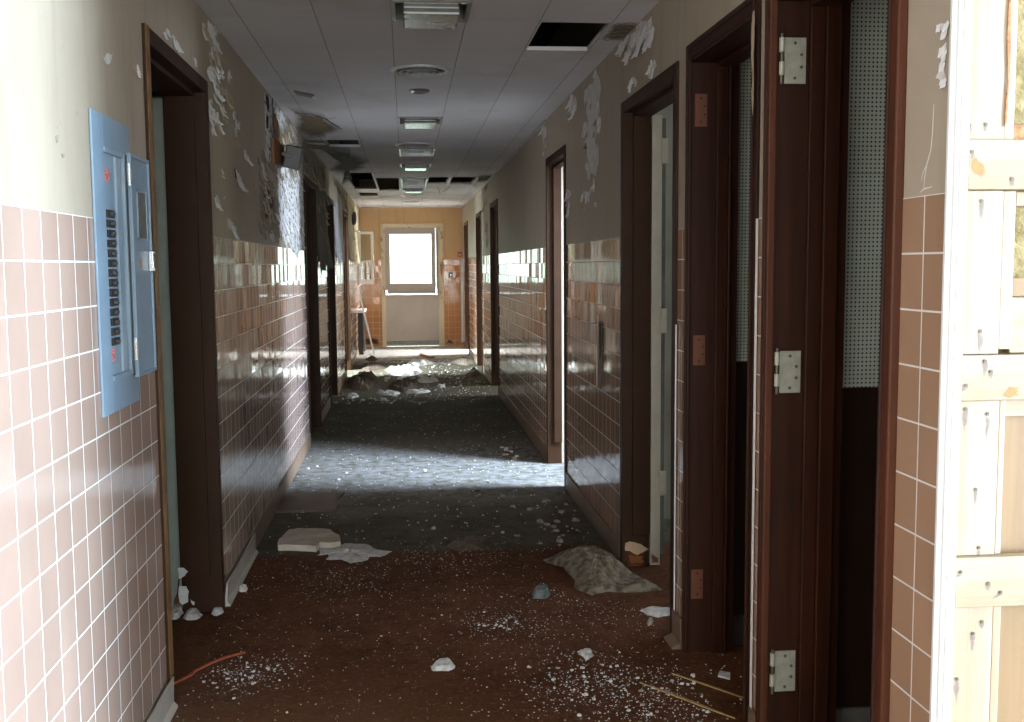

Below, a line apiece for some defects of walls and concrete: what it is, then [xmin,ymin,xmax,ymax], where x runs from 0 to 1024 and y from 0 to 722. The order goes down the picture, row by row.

peeling [615,17,657,93]
peeling [936,19,949,89]
peeling [163,21,360,276]
peeling [563,70,601,219]
peeling [178,568,195,605]